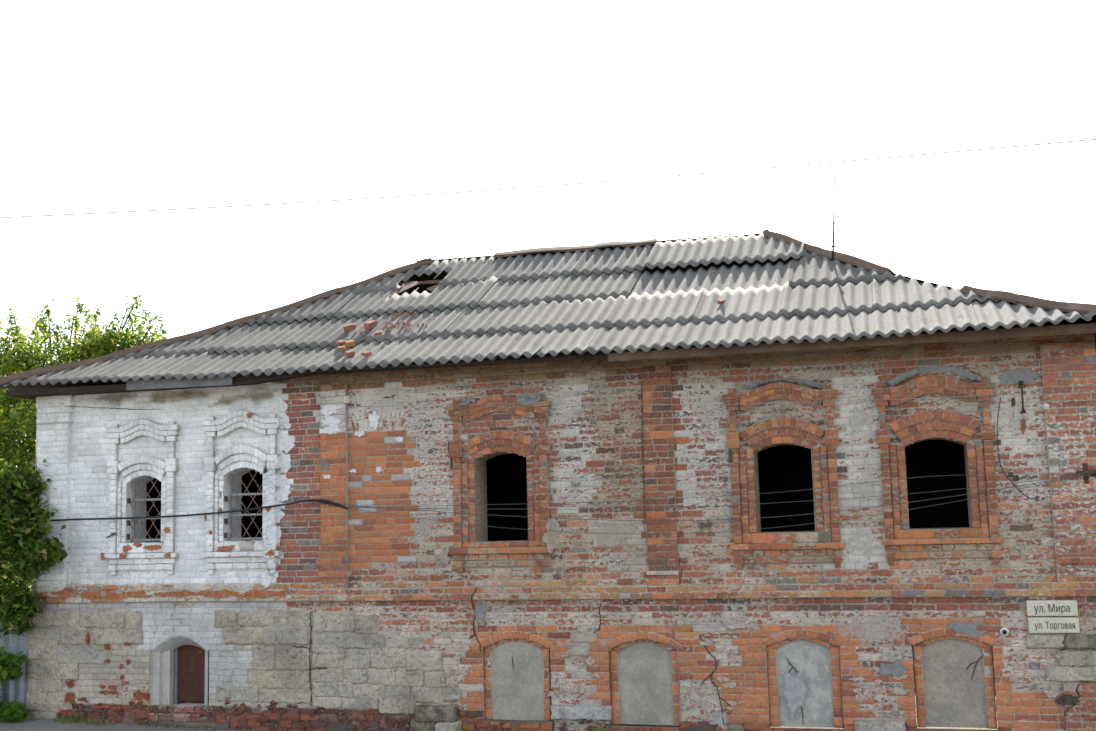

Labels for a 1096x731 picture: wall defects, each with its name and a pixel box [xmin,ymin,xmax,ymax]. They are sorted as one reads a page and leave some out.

peeling [319,403,345,434]
peeling [354,410,380,437]
spalling [216,700,411,731]
spalling [559,719,610,731]
spalling [680,677,741,730]